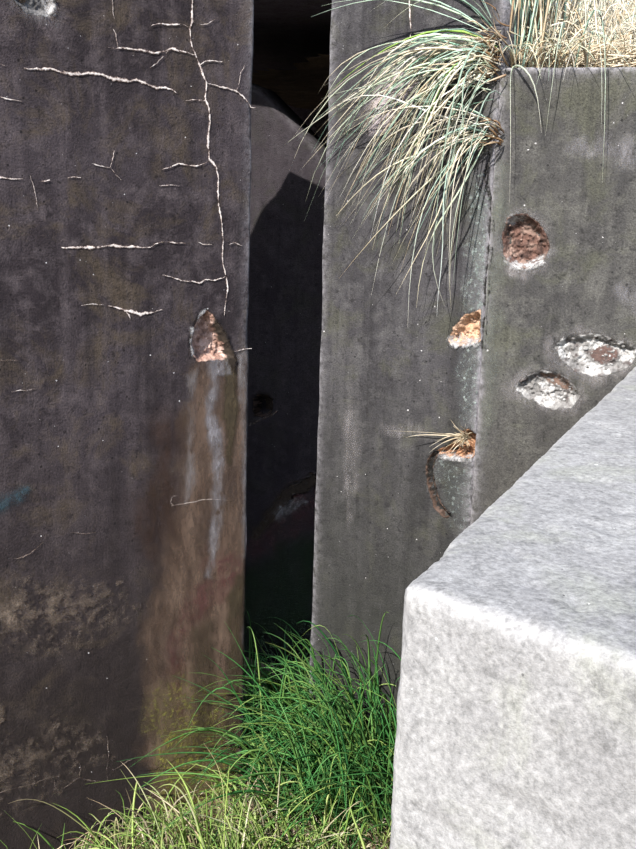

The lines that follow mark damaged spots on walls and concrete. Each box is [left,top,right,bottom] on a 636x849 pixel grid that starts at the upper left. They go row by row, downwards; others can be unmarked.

spalling [14,0,55,17]
crack [0,0,254,315]
spalling [502,213,550,269]
crack [81,303,163,319]
spalling [190,310,237,371]
spalling [449,310,481,348]
spalling [555,333,636,376]
spalling [515,370,580,410]